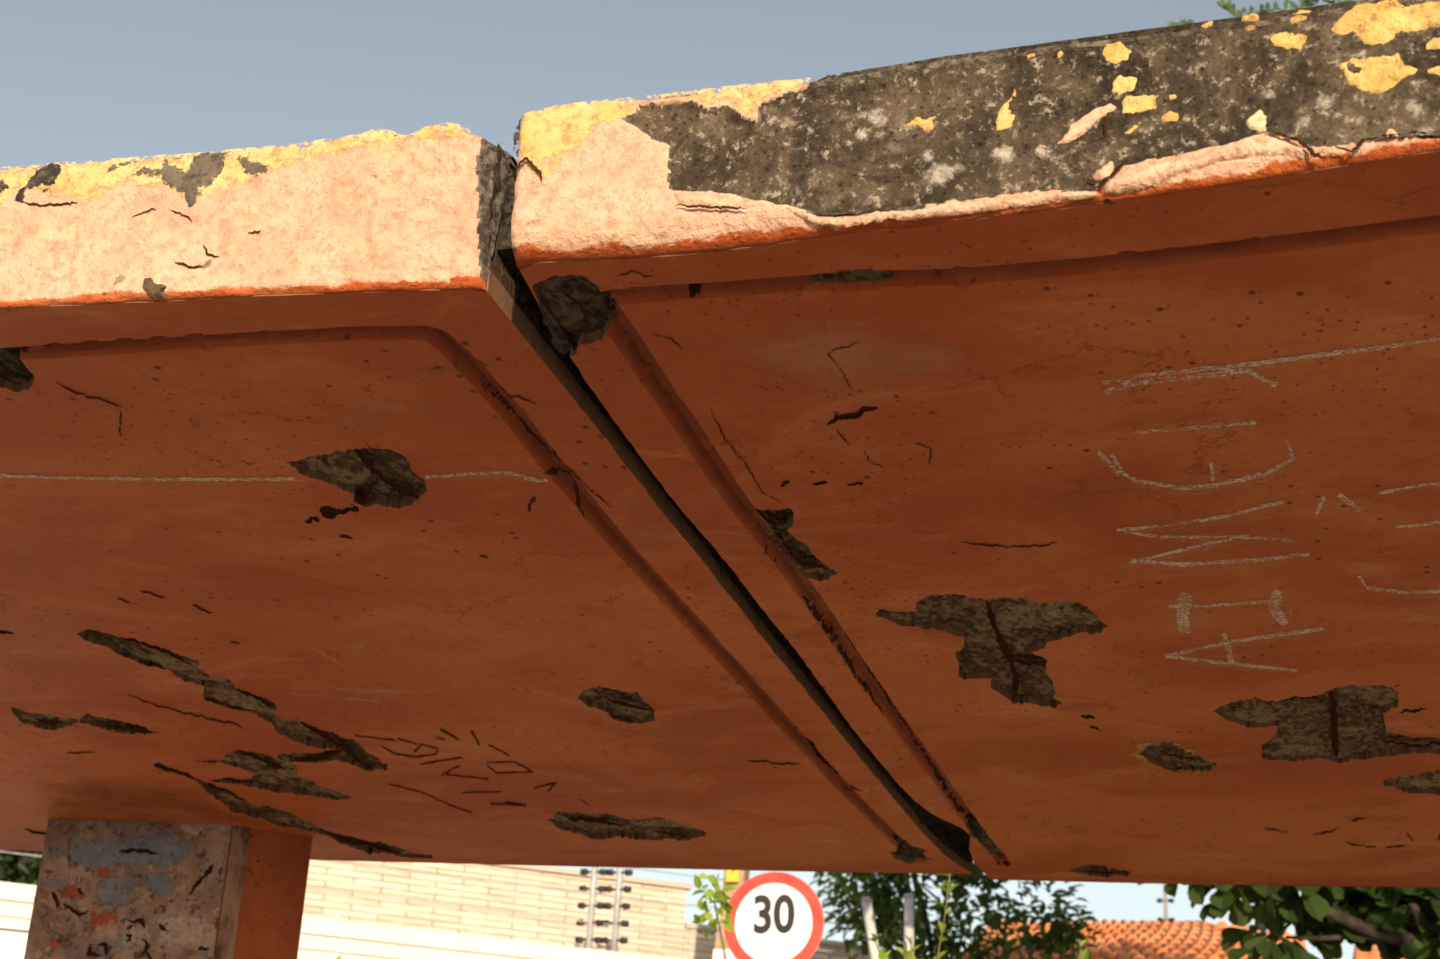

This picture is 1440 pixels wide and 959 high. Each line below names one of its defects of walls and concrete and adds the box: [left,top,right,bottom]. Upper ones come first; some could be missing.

peeling [0,122,471,205]
crack [516,157,542,180]
crack [677,203,749,211]
spalling [519,0,1440,227]
spalling [299,447,426,524]
crack [482,383,611,521]
crack [711,342,883,503]
spalling [879,594,1103,702]
spalling [86,629,430,855]
crack [748,725,860,791]
crack [797,594,973,829]
spalling [1218,684,1440,758]